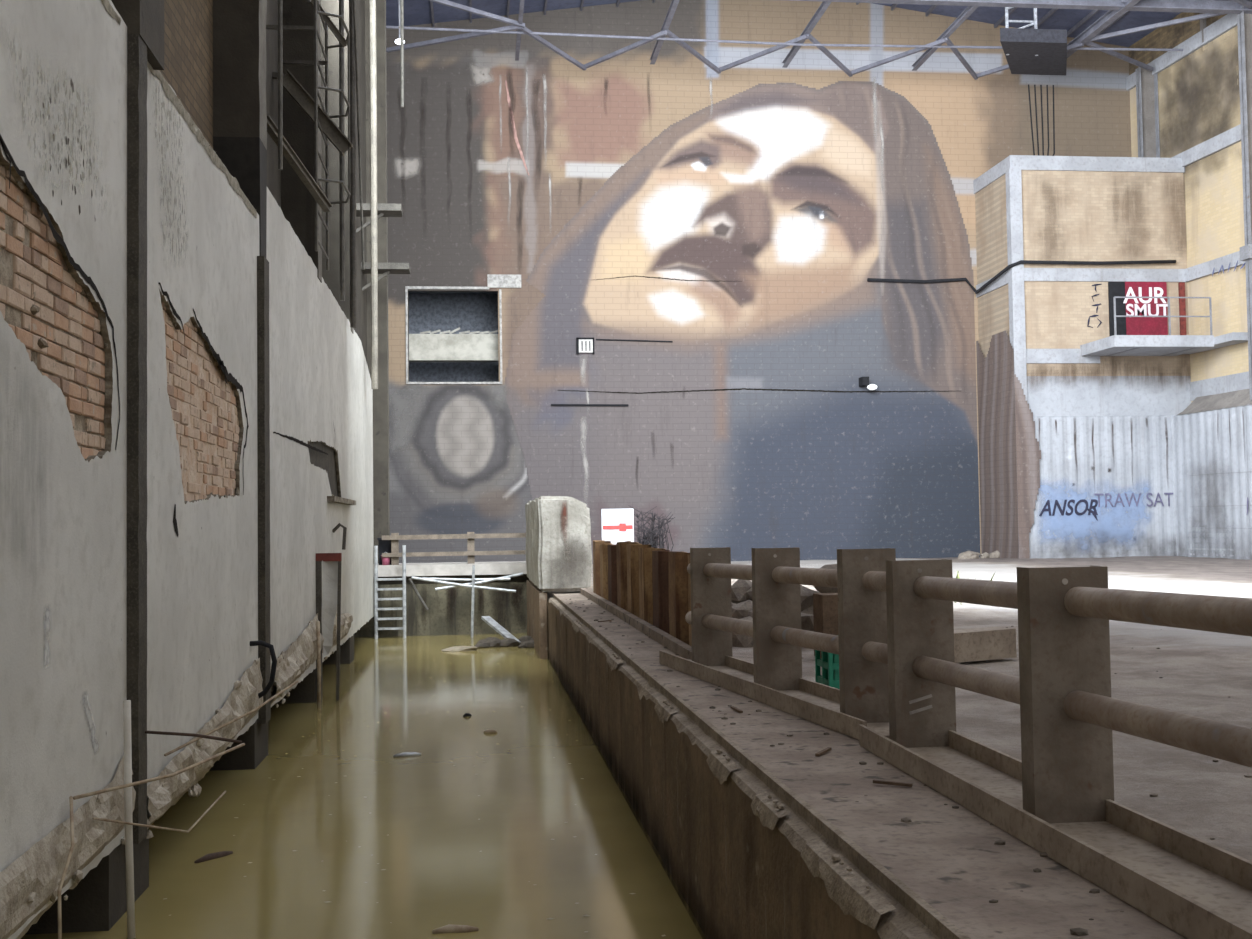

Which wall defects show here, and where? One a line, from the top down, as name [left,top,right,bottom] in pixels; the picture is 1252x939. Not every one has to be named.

spalling [43,94,93,215]
spalling [0,164,108,459]
spalling [161,302,240,502]